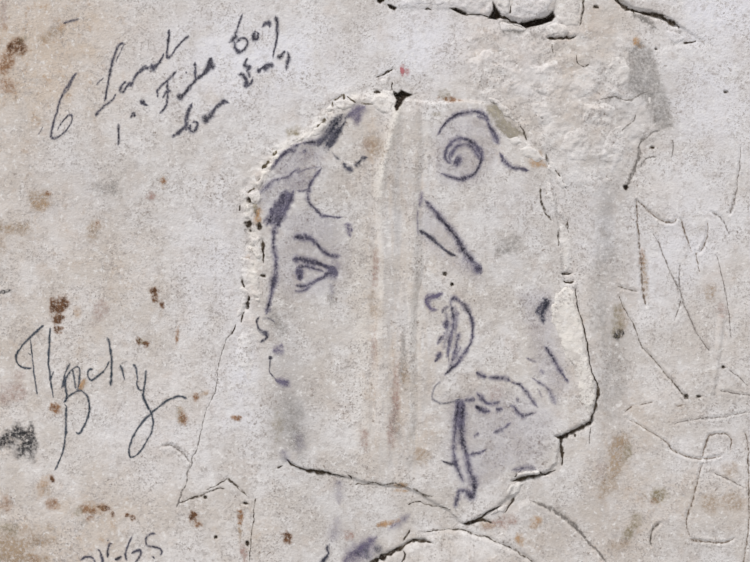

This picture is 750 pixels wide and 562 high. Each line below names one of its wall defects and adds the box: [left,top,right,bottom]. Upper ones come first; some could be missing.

spalling [402,0,580,37]
rust [0,37,26,89]
rust [50,297,69,333]
crack [177,279,256,560]
crack [371,273,605,562]
crack [277,459,450,510]